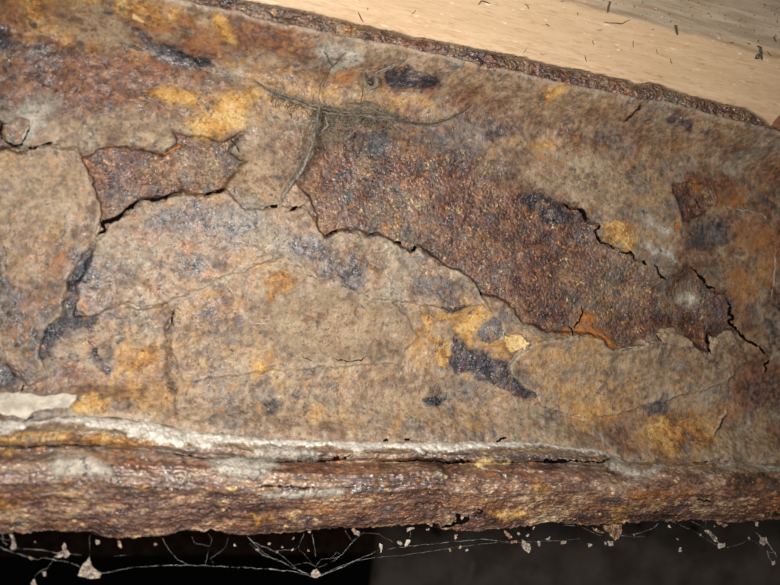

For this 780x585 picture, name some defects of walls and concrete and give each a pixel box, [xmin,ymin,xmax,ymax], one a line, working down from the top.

peeling [0,117,30,150]
crack [0,120,52,155]
rust [187,87,264,140]
spalling [81,129,246,222]
crack [97,191,182,237]
crack [265,204,302,212]
crack [563,203,666,280]
crack [689,266,770,373]
peeling [0,391,78,420]
rust [55,543,70,558]
rust [488,508,550,553]
rust [592,511,627,546]